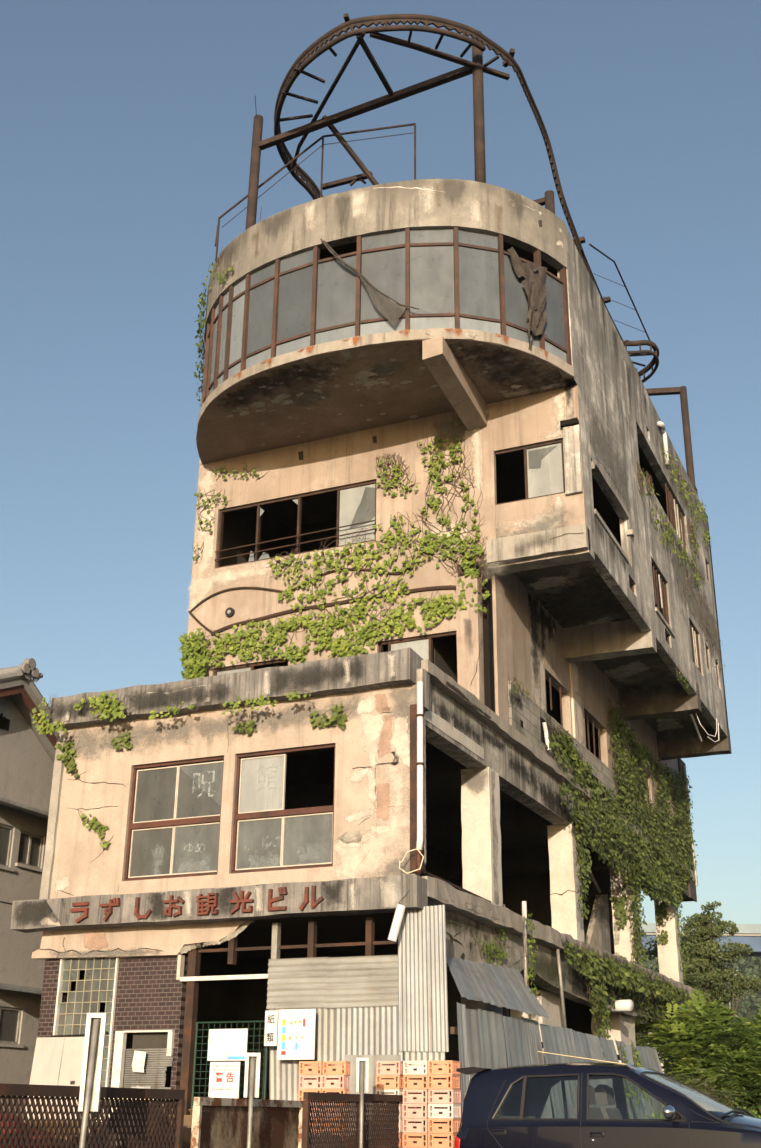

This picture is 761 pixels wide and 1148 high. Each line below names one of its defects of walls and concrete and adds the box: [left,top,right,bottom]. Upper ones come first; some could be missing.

damp [266,211,289,235]
damp [337,194,363,218]
damp [556,228,631,413]
damp [223,361,338,407]
damp [448,344,572,439]
damp [592,411,629,510]
damp [52,698,105,716]
damp [128,682,228,707]
damp [266,656,363,690]
damp [528,573,639,691]
flaking render [333,693,426,879]
damp [432,705,649,874]